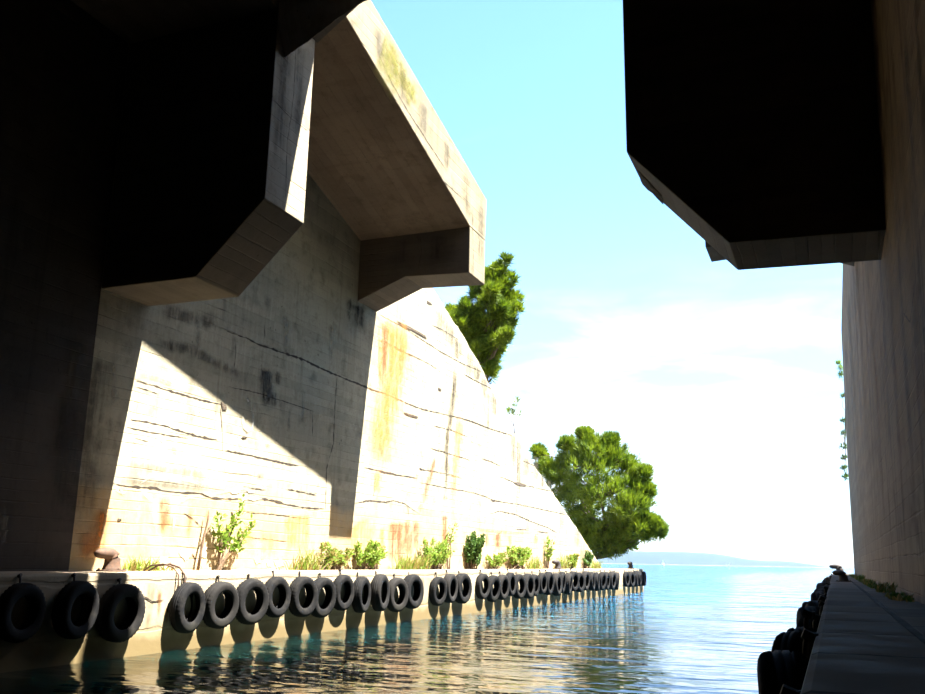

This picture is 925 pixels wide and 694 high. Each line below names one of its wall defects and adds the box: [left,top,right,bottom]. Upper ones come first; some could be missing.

crack [114,315,571,534]
corrosion [375,328,405,452]
water stain [445,375,456,479]
corrosion [382,522,418,558]